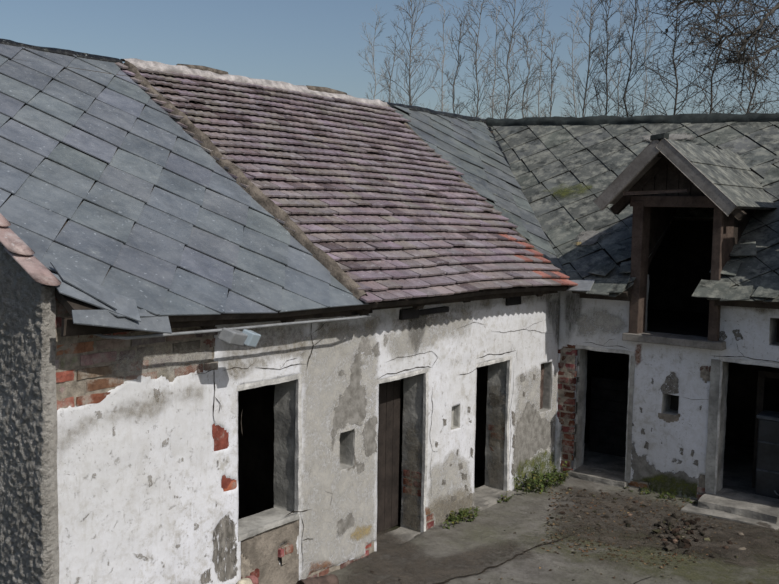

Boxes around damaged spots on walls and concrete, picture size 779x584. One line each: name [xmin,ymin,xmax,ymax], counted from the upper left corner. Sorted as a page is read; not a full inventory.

flaking render [55,297,218,419]
crack [198,323,325,423]
crack [460,321,542,375]
spalling [652,372,679,394]
flaking render [700,366,711,383]
flaking render [212,423,229,451]
flaking render [488,344,578,490]
flaking render [221,475,237,491]
peeling [201,515,260,584]
water stain [345,526,527,584]